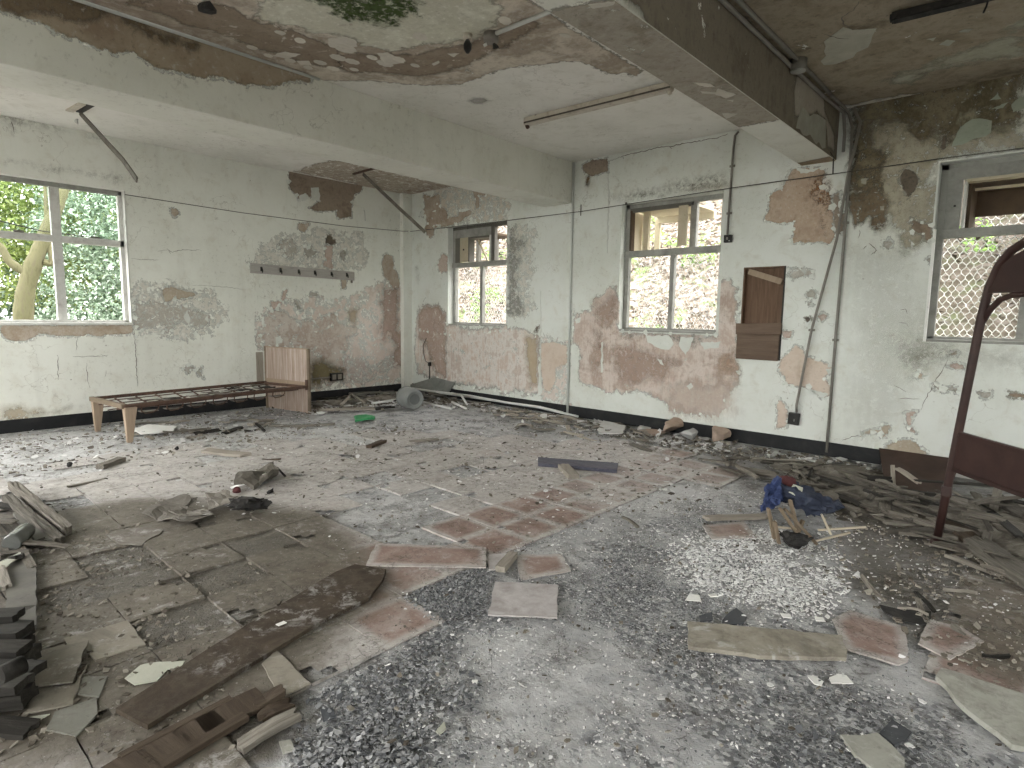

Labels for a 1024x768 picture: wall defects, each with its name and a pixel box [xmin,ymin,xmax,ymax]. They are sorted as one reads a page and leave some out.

peeling [0,0,779,127]
damp [626,0,1024,247]
peeling [764,163,845,245]
peeling [0,278,229,344]
peeling [246,172,401,391]
damp [506,229,524,314]
peeling [414,186,741,417]
peeling [775,330,832,429]